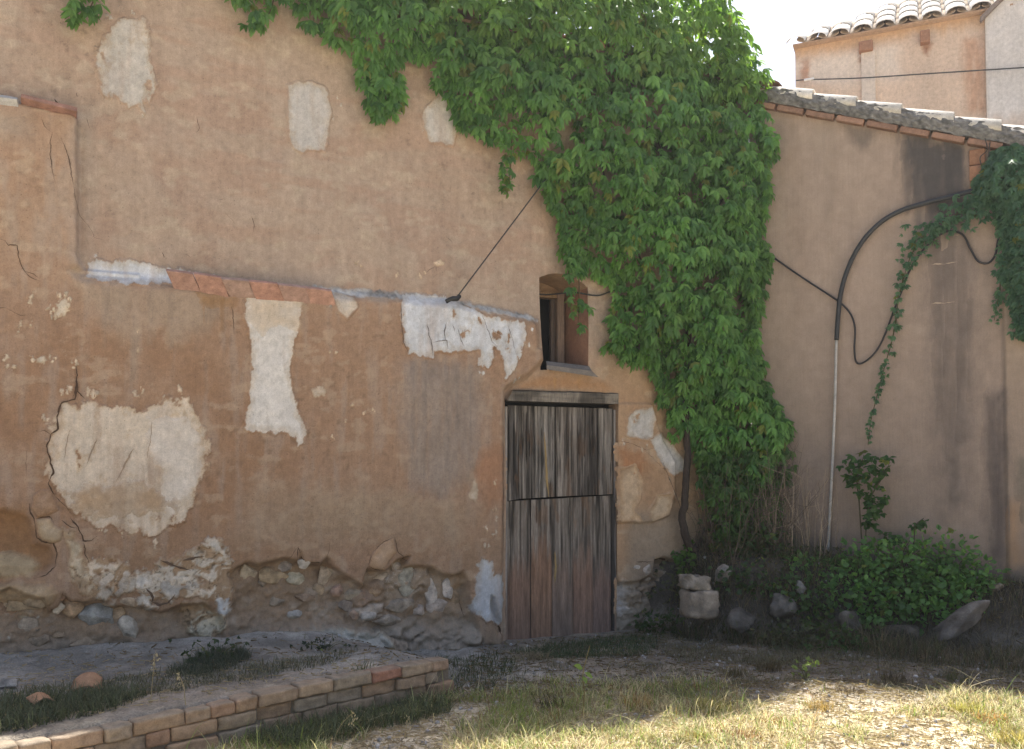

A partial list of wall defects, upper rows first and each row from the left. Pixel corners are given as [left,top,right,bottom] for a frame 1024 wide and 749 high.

crack [43,100,98,239]
flaking render [92,5,159,119]
flaking render [285,79,343,155]
flaking render [420,91,458,148]
flaking render [82,254,216,288]
flaking render [241,297,310,449]
flaking render [397,291,534,384]
damp [774,111,1024,568]
crack [26,368,97,577]
flaking render [0,384,506,647]
flaking render [614,386,684,524]